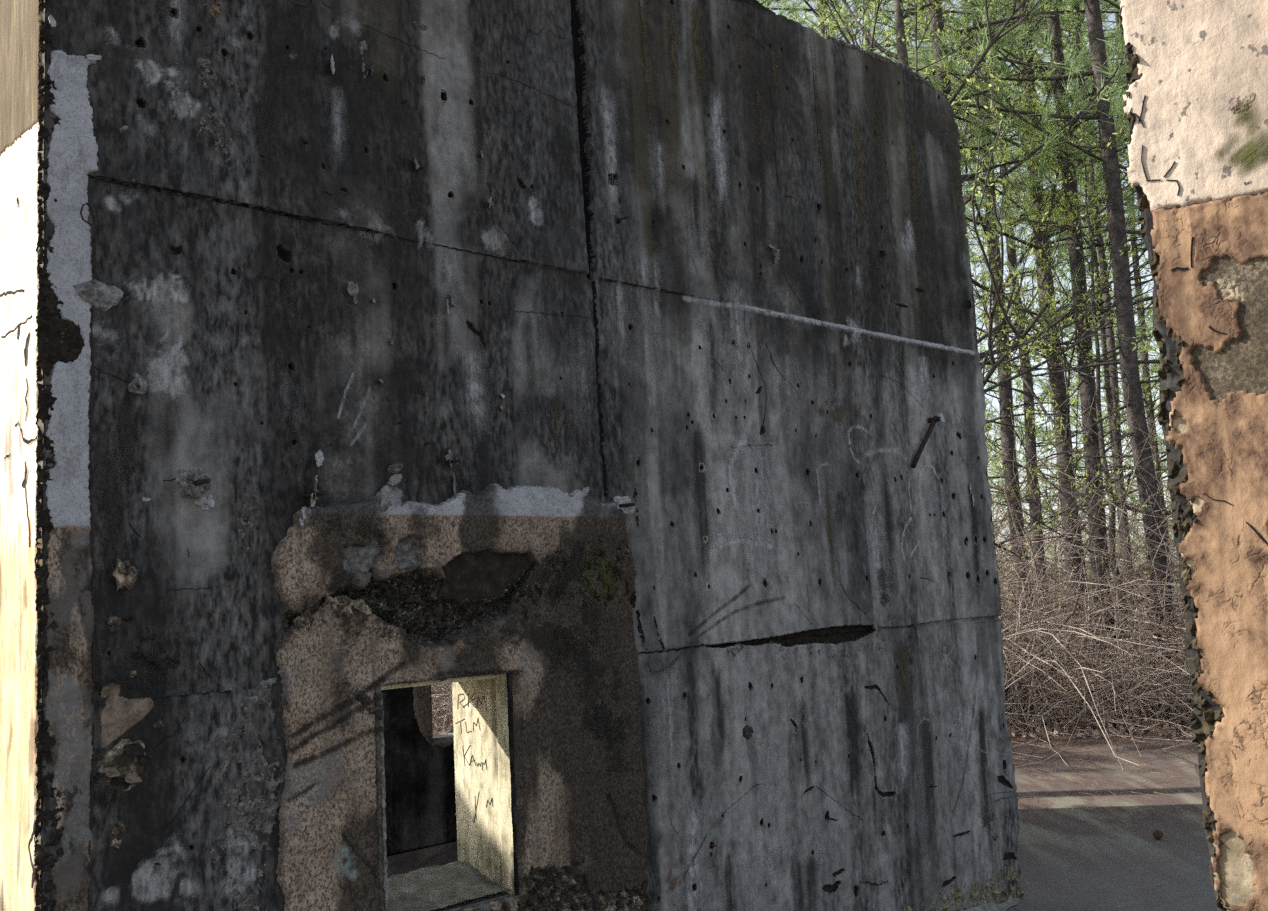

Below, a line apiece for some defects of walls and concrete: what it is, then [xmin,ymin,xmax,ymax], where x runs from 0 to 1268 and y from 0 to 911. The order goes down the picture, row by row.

spalling [1119,5,1143,144]
spalling [34,0,85,911]
spalling [280,535,665,651]
peeling [613,488,639,526]
peeling [1135,184,1268,911]
spalling [347,689,384,720]
spalling [457,868,646,911]